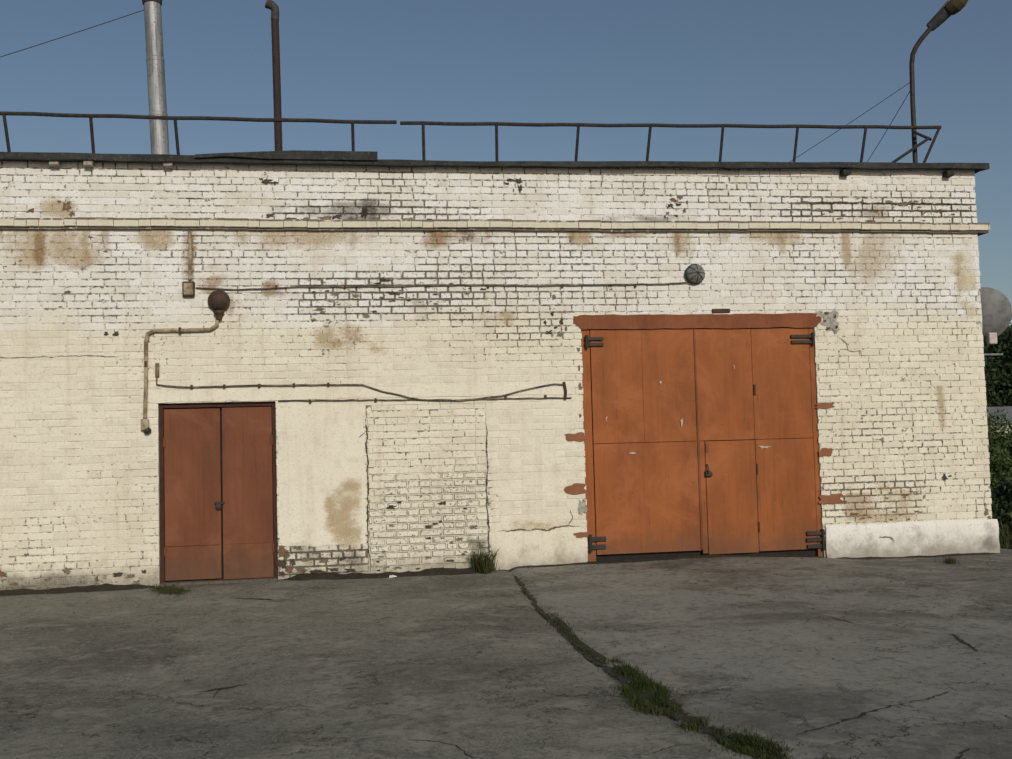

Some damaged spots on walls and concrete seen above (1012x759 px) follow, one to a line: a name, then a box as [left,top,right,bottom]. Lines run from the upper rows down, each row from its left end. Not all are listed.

damp [326,482,360,545]
crack [514,576,948,759]
crack [954,635,977,651]